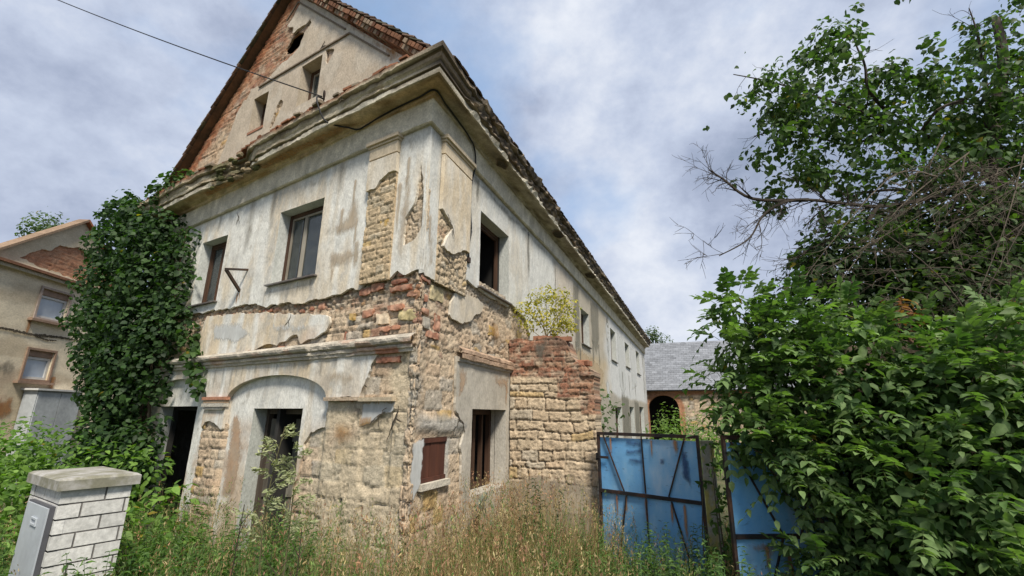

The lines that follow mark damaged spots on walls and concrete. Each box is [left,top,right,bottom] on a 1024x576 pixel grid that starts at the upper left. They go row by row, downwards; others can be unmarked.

flaking render [183,0,311,190]
flaking render [338,17,410,56]
flaking render [20,246,112,287]
flaking render [156,158,528,576]